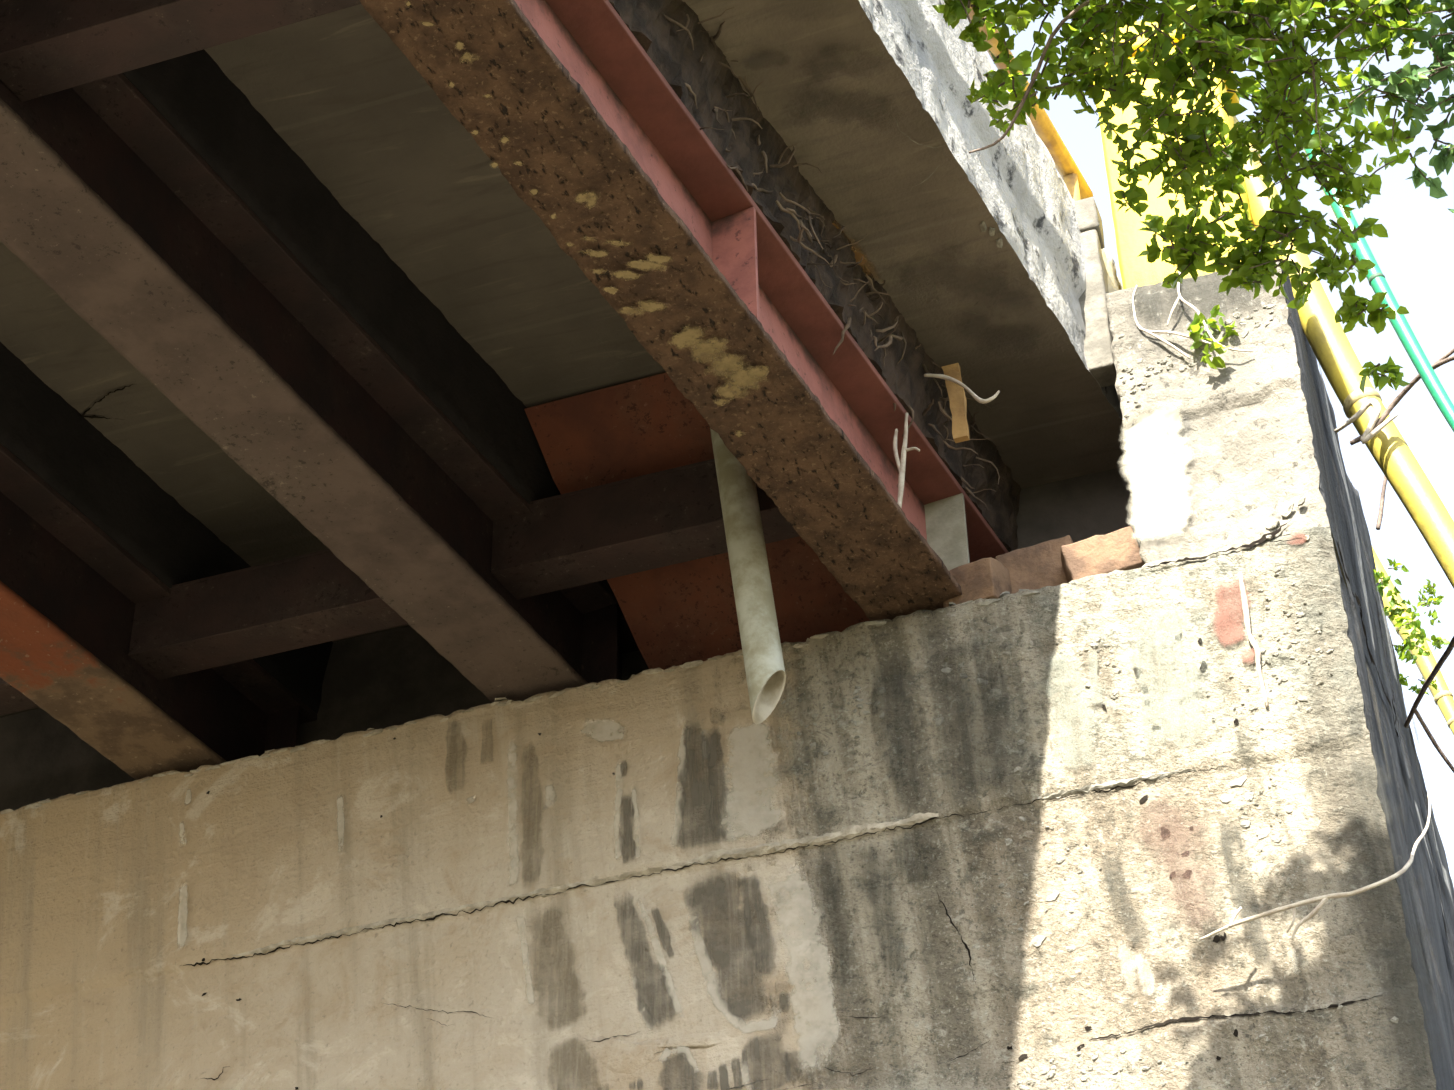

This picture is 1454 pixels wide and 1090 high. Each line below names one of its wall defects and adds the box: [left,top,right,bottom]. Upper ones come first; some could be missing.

crack [1143,517,1297,568]
crack [1336,541,1403,759]
water stain [507,743,555,884]
water stain [615,762,640,862]
crack [183,766,1231,967]
water stain [672,724,780,847]
water stain [521,911,578,1027]
water stain [615,901,682,1027]
water stain [660,866,843,1090]
crack [730,1067,876,1090]
crack [936,890,976,983]
crack [1089,996,1378,1041]